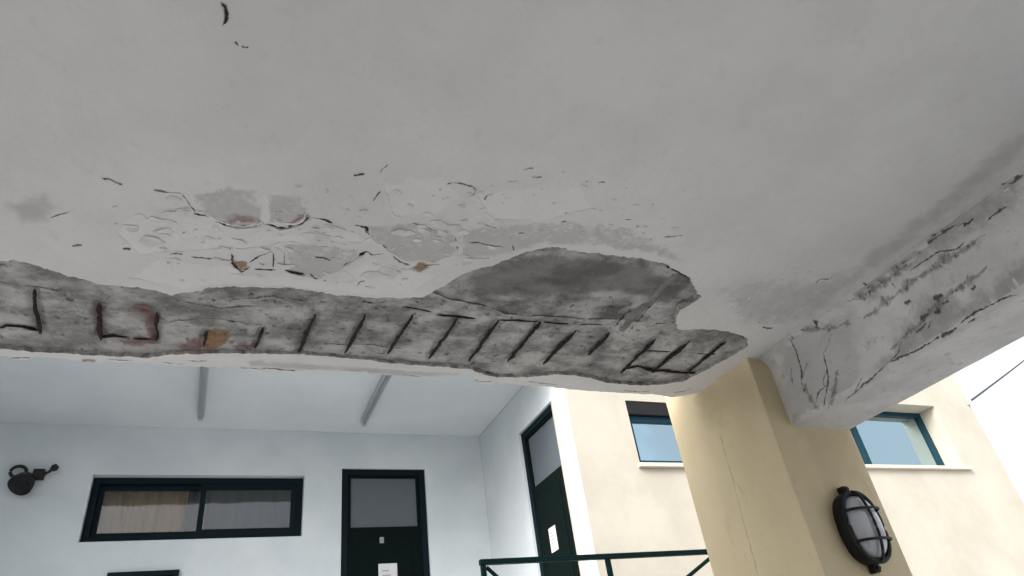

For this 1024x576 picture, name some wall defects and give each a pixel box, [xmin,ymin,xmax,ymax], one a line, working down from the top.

crack [988,174,1023,220]
spalling [0,168,748,393]
crack [863,224,963,296]
rust [181,329,247,350]
crack [788,295,1016,405]